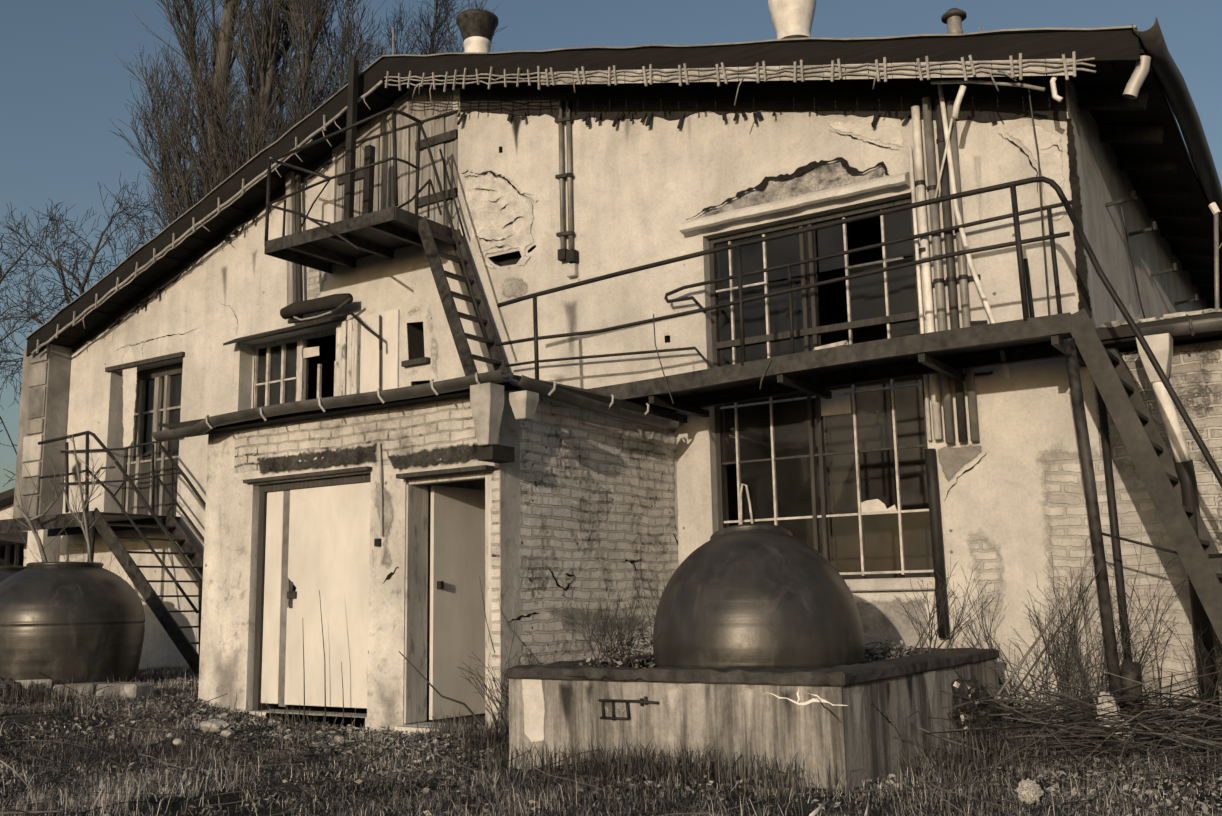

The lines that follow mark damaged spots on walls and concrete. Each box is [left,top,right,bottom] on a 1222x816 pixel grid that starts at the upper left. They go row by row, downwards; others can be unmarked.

spalling [461,168,538,269]
spalling [686,121,904,220]
crack [116,331,191,351]
peeling [938,445,986,501]